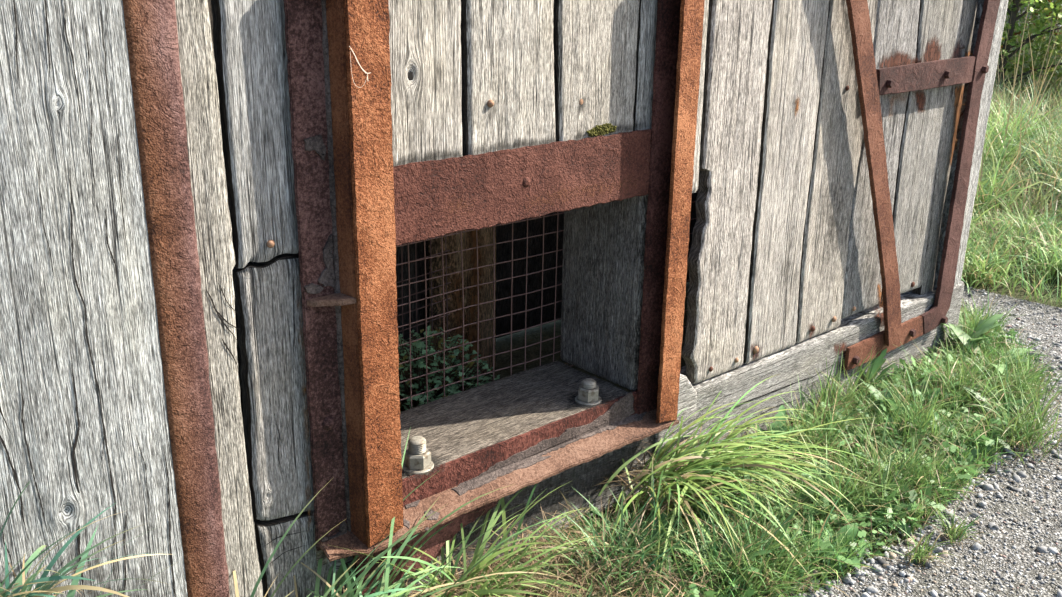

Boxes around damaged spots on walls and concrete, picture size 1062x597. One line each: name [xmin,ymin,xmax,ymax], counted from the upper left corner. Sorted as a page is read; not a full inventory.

crack [12,0,20,89]
rust [916,91,925,111]
rust [879,39,973,68]
rust [949,85,966,164]
crack [35,0,176,597]
crack [203,285,240,429]
crack [244,257,295,360]
crack [0,372,50,567]
rust [452,392,647,496]